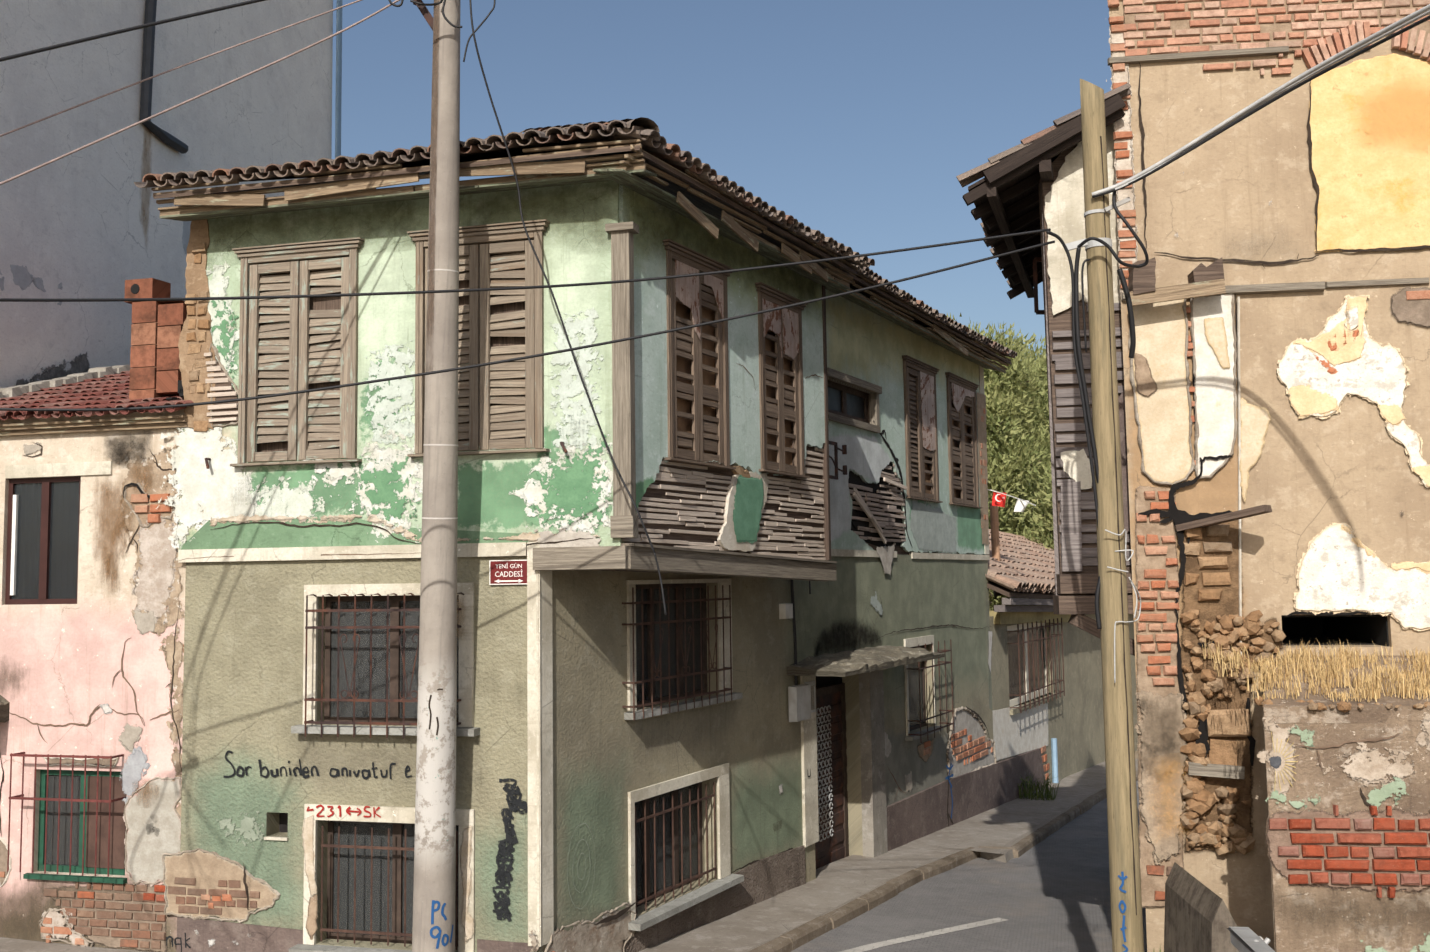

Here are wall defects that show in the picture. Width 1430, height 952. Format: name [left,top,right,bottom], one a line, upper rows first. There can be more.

crack [1138,62,1319,389]
flaking render [1106,0,1430,301]
peeling [457,302,613,548]
peeling [1288,384,1339,418]
peeling [1293,296,1369,374]
crack [0,755,8,833]
crack [9,610,182,771]
peeling [39,261,423,952]
spalling [924,706,997,782]
flaking render [1128,293,1238,908]
flaking render [1255,709,1430,898]
spalling [526,898,636,952]